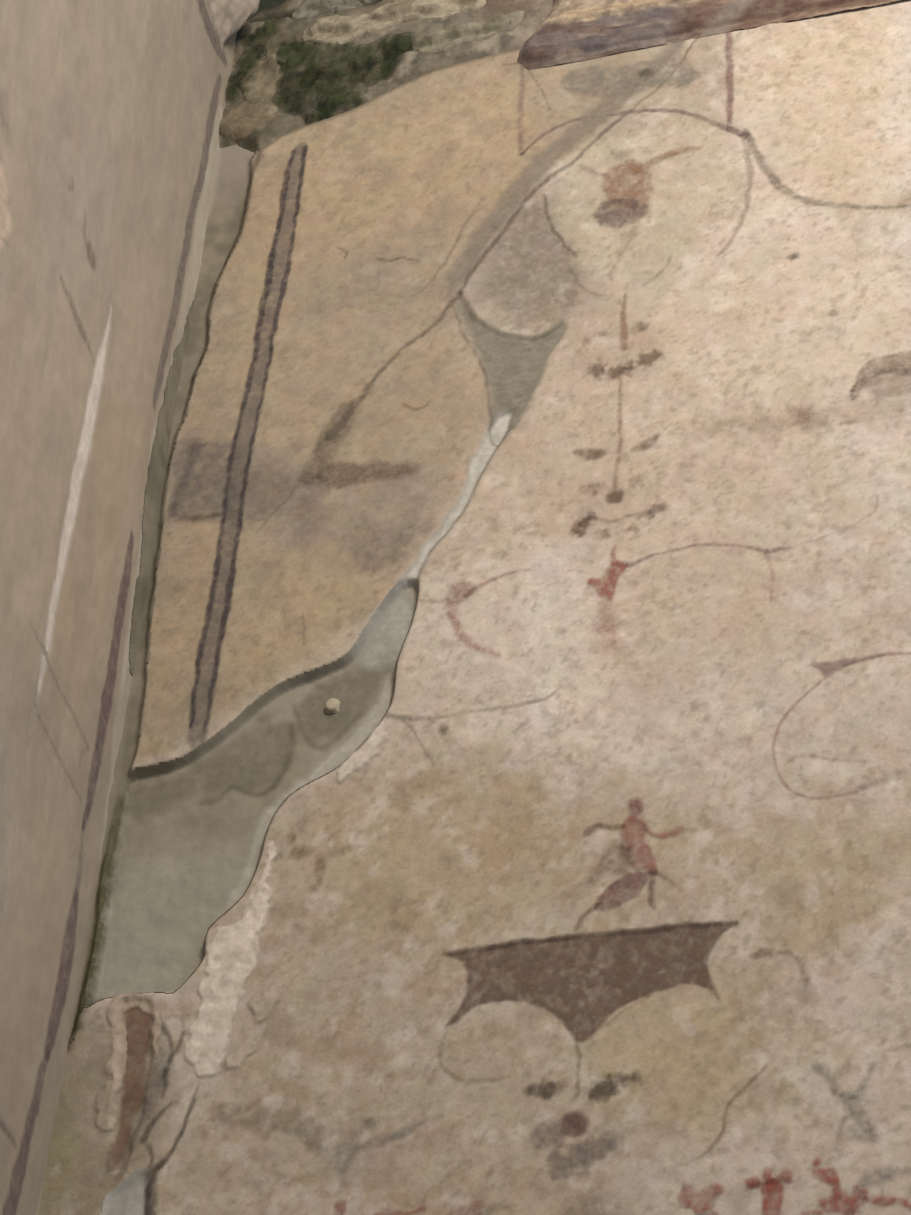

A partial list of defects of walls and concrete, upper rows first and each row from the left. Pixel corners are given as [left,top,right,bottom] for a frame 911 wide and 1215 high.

spalling [69,0,566,1131]
spalling [100,1168,151,1215]